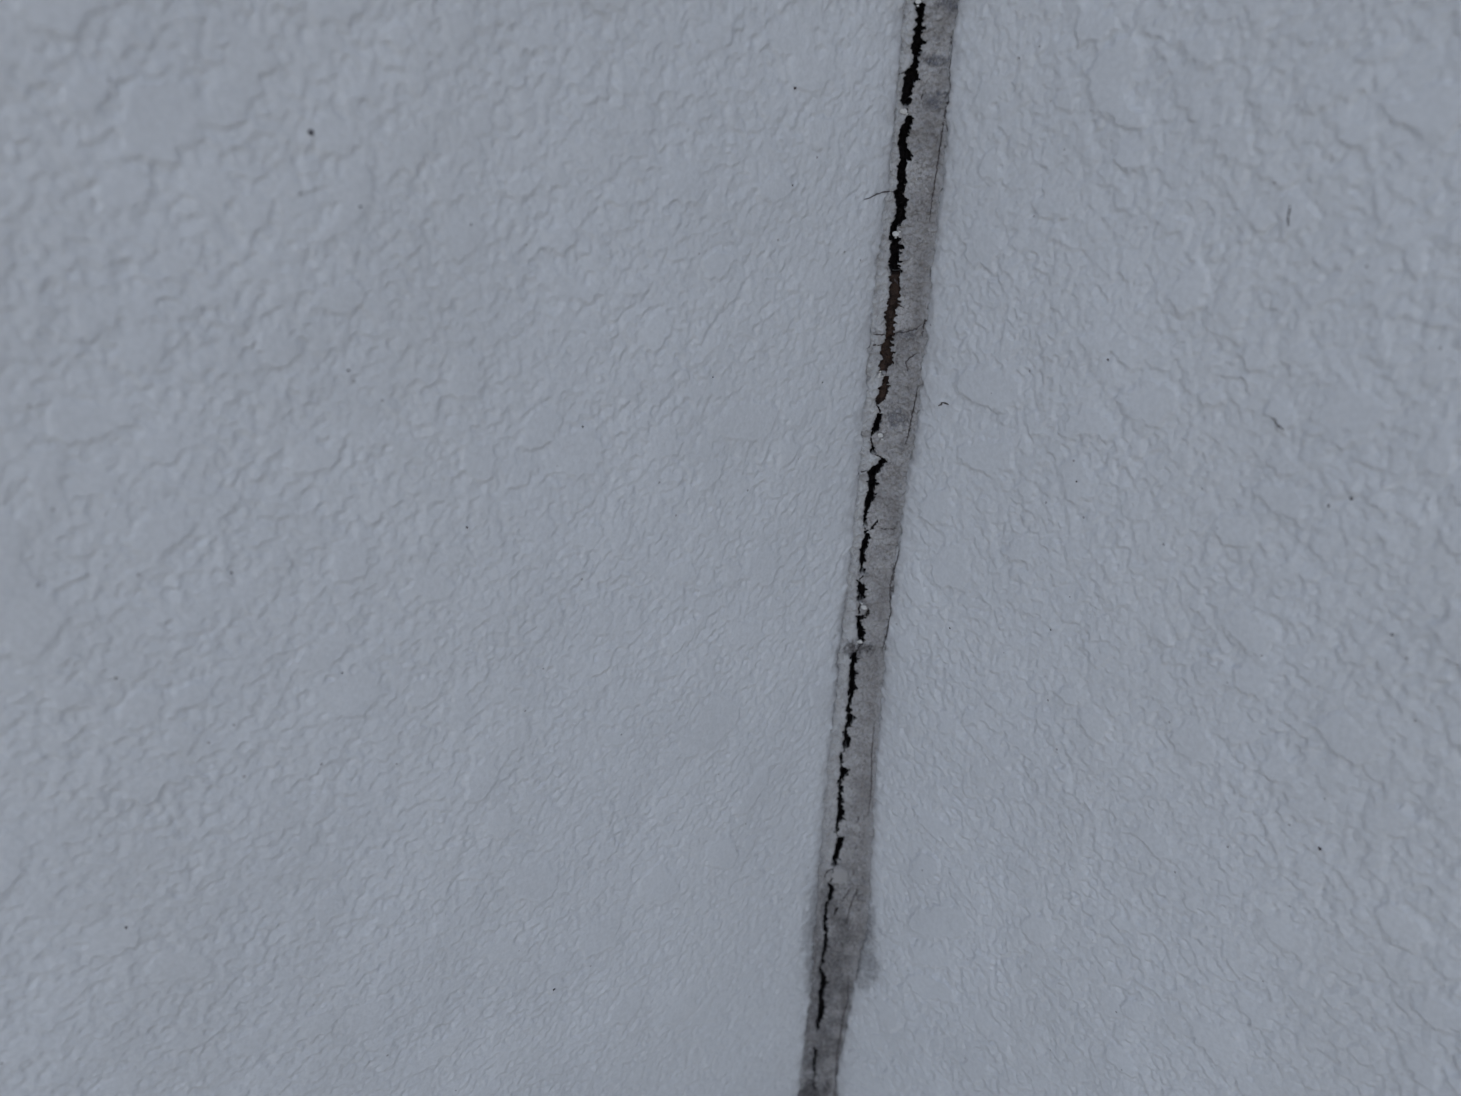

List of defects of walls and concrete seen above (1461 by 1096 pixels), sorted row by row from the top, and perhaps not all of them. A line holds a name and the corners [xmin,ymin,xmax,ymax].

crack [806,2,953,1096]